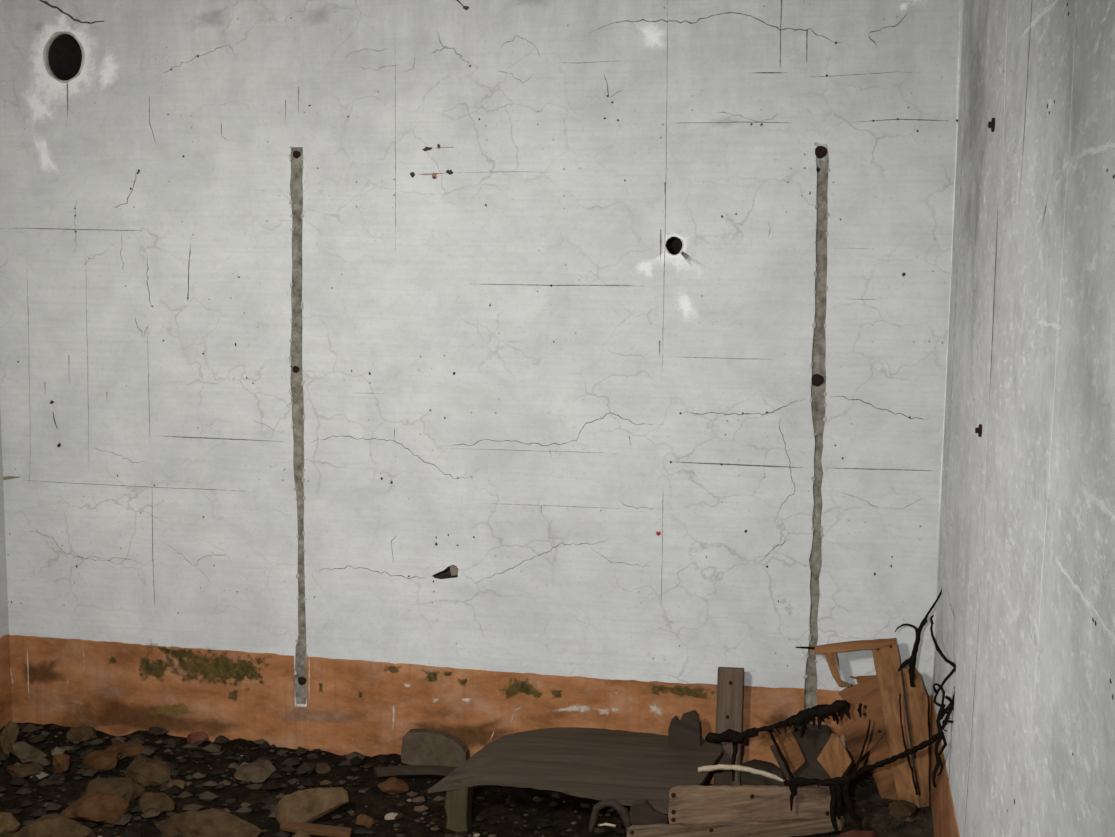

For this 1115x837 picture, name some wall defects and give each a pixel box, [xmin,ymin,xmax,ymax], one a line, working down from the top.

crack [602,12,837,53]
crack [709,112,787,125]
crack [30,172,164,342]
crack [485,281,628,289]
crack [148,375,282,442]
crack [840,396,921,419]
crack [324,429,464,479]
crack [459,412,651,454]
crack [670,401,802,515]
crack [840,468,928,509]
crack [334,536,419,579]
crack [480,504,663,592]